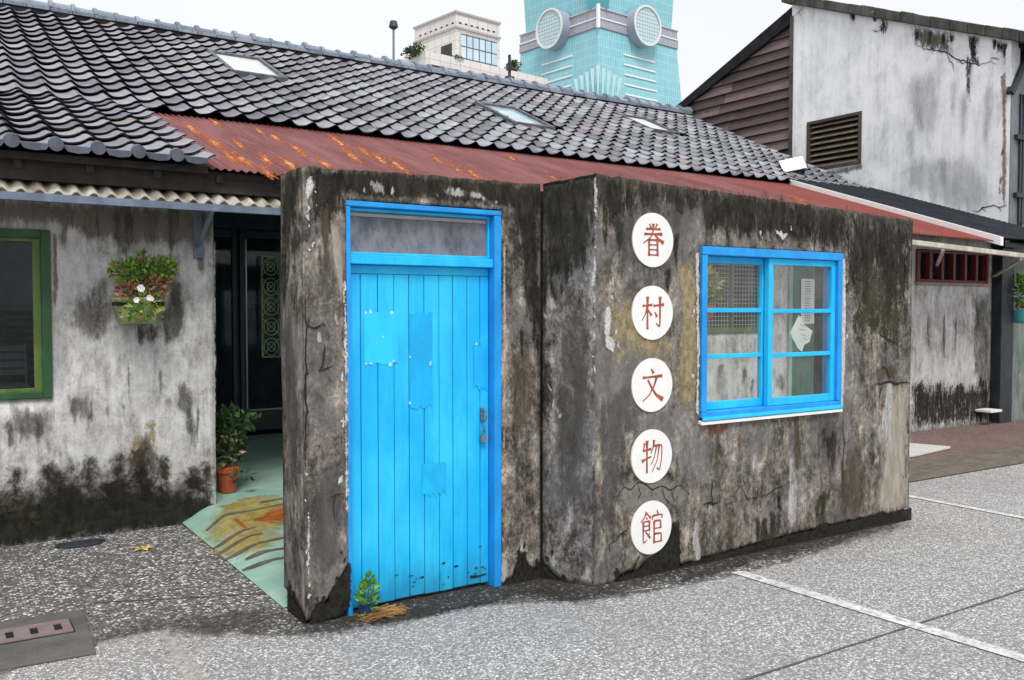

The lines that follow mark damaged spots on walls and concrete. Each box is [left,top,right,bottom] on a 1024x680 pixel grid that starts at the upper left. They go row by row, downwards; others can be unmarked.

crack [921,46,999,69]
water stain [966,35,1007,97]
corrosion [182,118,333,179]
corrosion [328,134,410,175]
crack [304,293,332,470]
water stain [281,167,912,505]
water stain [911,299,991,428]
water stain [0,420,262,547]
crack [612,474,792,512]